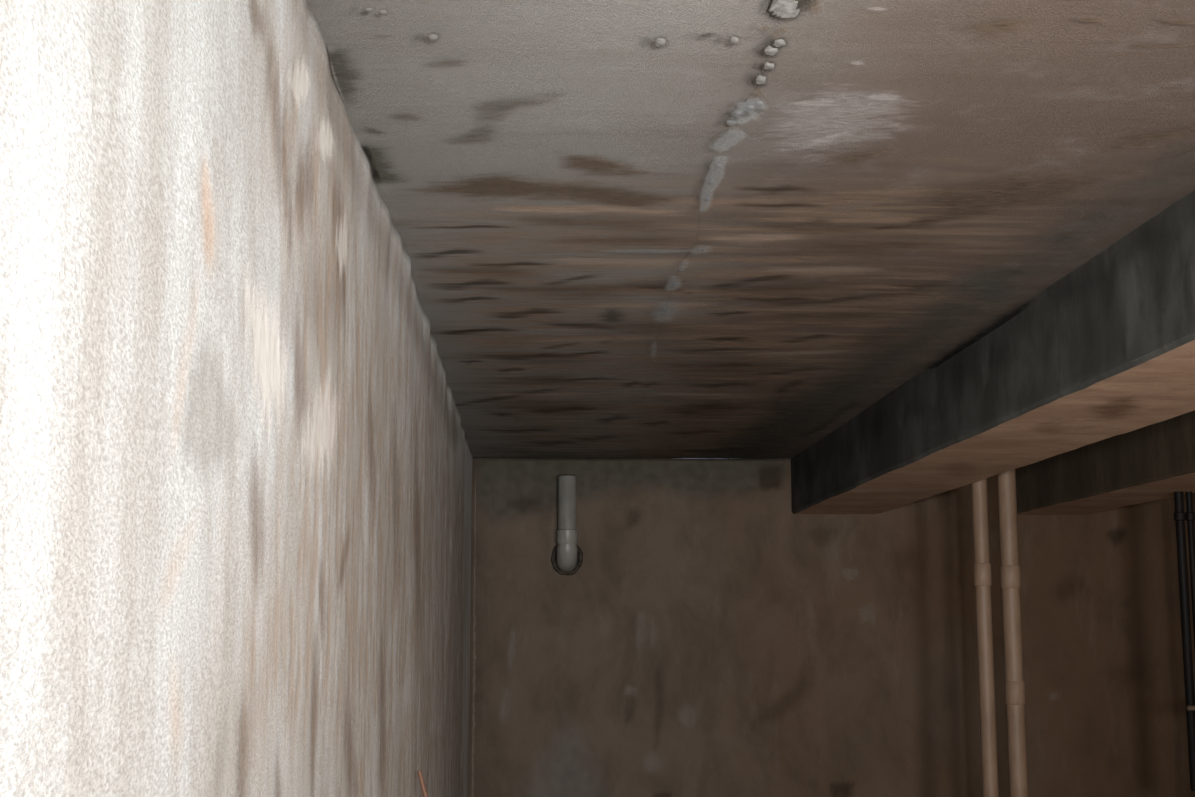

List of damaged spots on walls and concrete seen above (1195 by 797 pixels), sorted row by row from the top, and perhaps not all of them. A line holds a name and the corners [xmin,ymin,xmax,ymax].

spalling [769,0,819,19]
damp [328,49,358,101]
damp [425,100,1098,487]